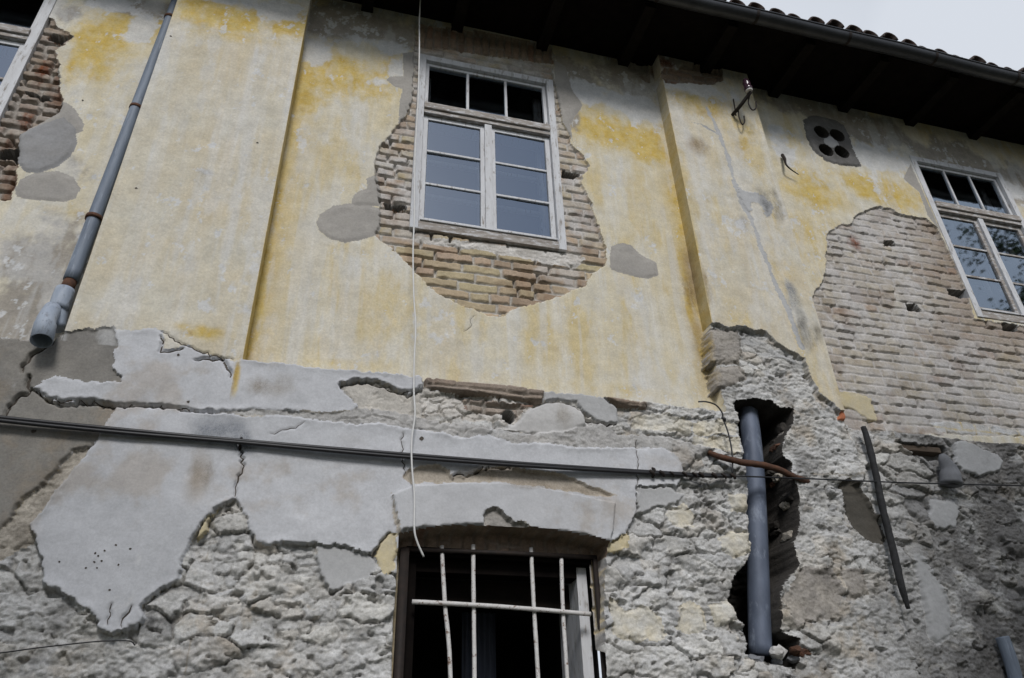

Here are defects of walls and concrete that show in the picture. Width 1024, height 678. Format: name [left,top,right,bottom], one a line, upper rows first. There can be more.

flaking render [0,17,74,201]
flaking render [374,24,607,317]
peeling [43,397,211,414]
crack [160,332,232,378]
crack [235,444,245,496]
peeling [403,205,1024,678]
peeling [0,447,401,678]